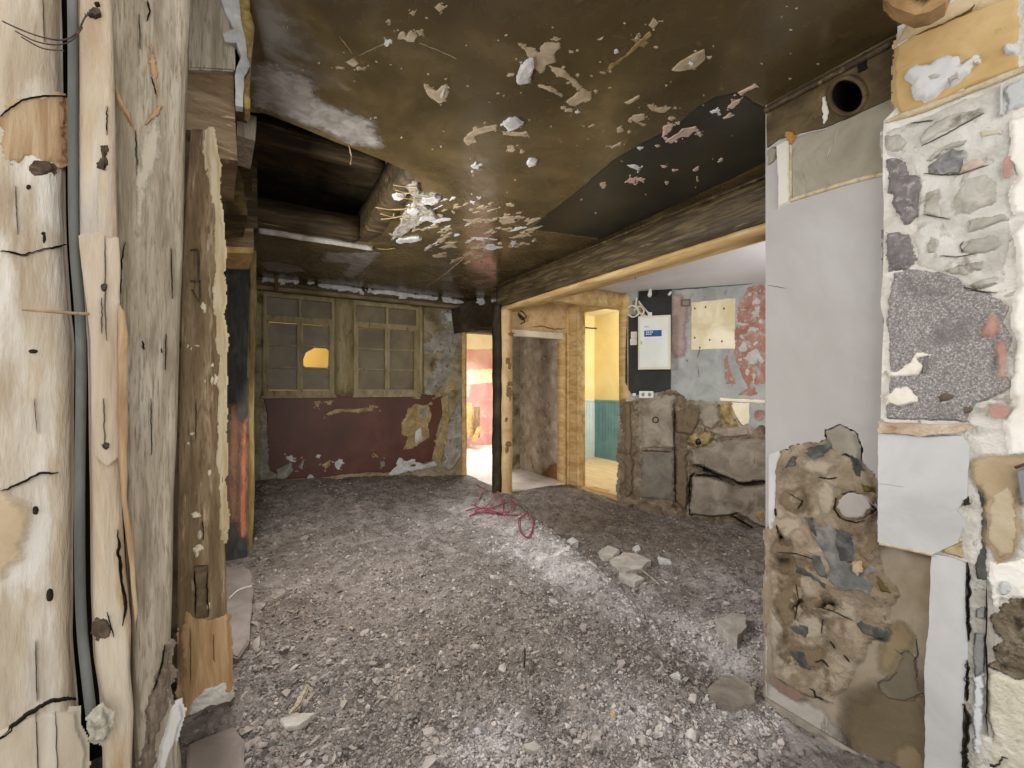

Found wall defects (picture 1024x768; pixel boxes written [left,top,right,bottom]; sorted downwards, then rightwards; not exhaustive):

water stain [250,62,382,147]
peeling [424,84,450,106]
peeling [507,37,598,114]
peeling [606,95,704,151]
spalling [672,49,712,71]
peeling [392,193,543,265]
flaking render [767,77,1024,423]
peeling [259,277,464,480]
corrosion [227,404,247,537]
crack [641,399,766,515]
spalling [616,284,931,750]
crack [833,483,901,523]